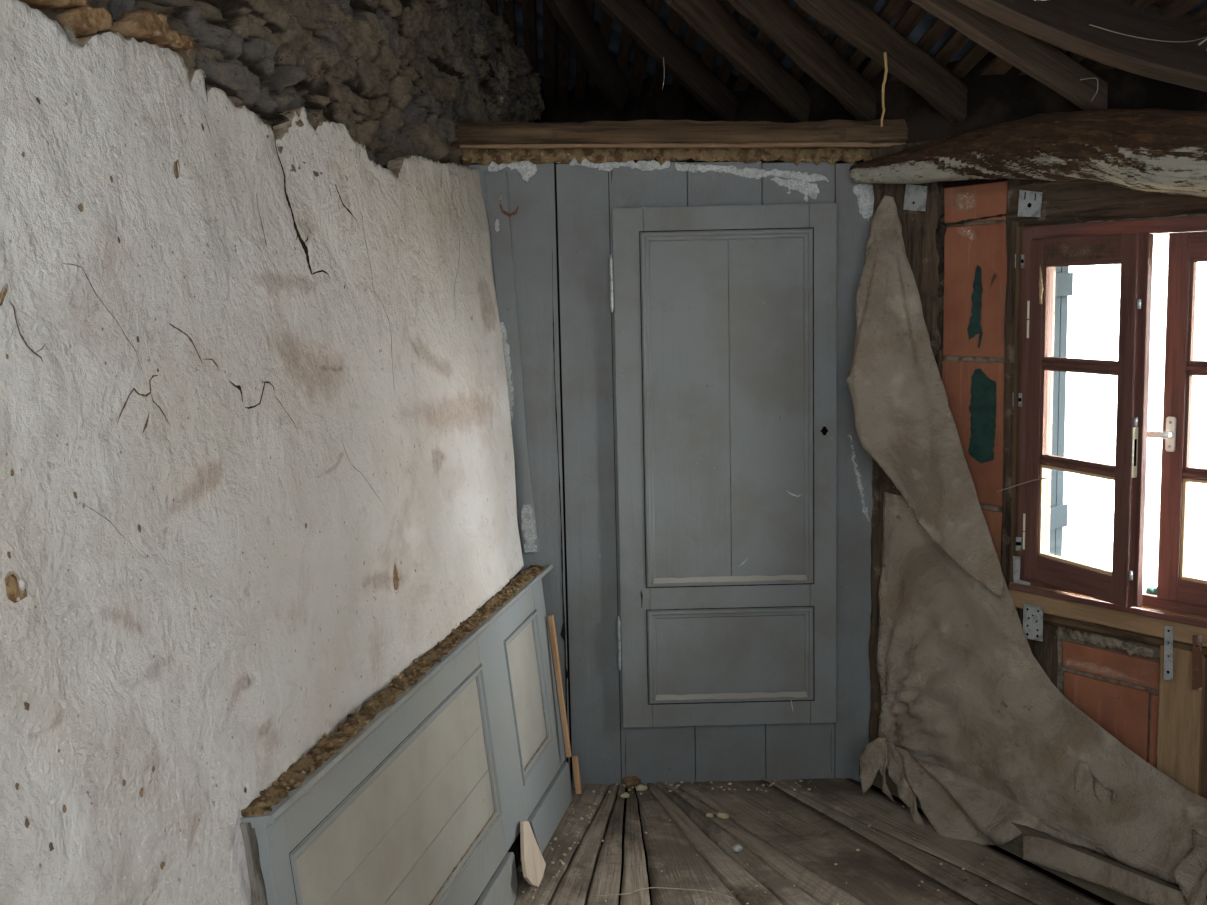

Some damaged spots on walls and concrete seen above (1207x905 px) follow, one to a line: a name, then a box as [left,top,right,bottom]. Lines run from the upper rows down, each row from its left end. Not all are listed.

peeling [488,161,537,182]
peeling [557,157,828,202]
crack [257,143,330,278]
crack [9,301,46,362]
crack [169,323,297,429]
spalling [4,552,27,603]